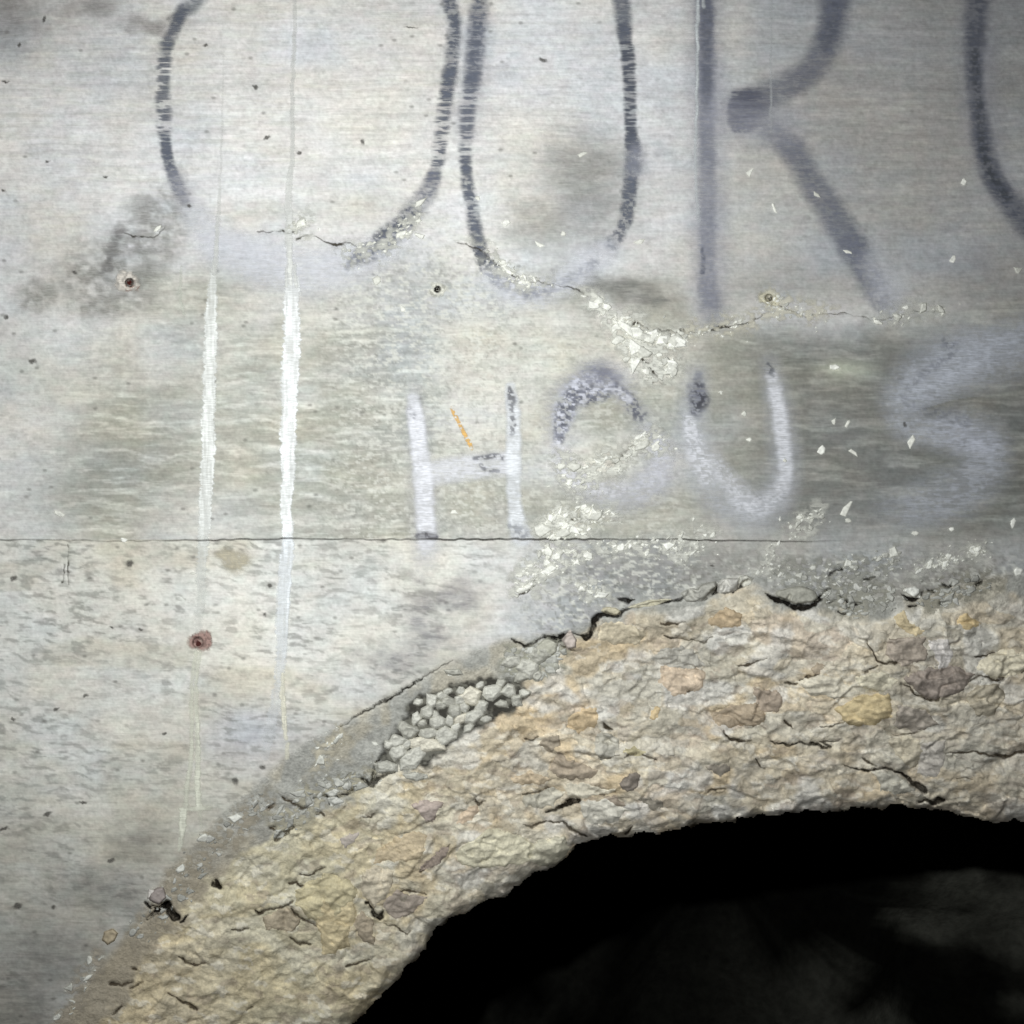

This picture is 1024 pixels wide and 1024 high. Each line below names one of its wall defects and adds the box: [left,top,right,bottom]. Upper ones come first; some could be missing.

crack [260,230,344,246]
spalling [580,287,832,386]
damp [197,217,219,595]
damp [275,36,302,760]
crack [511,598,635,648]
crack [712,568,875,615]
crack [902,584,951,608]
damp [178,651,206,850]
spalling [53,424,1024,1024]